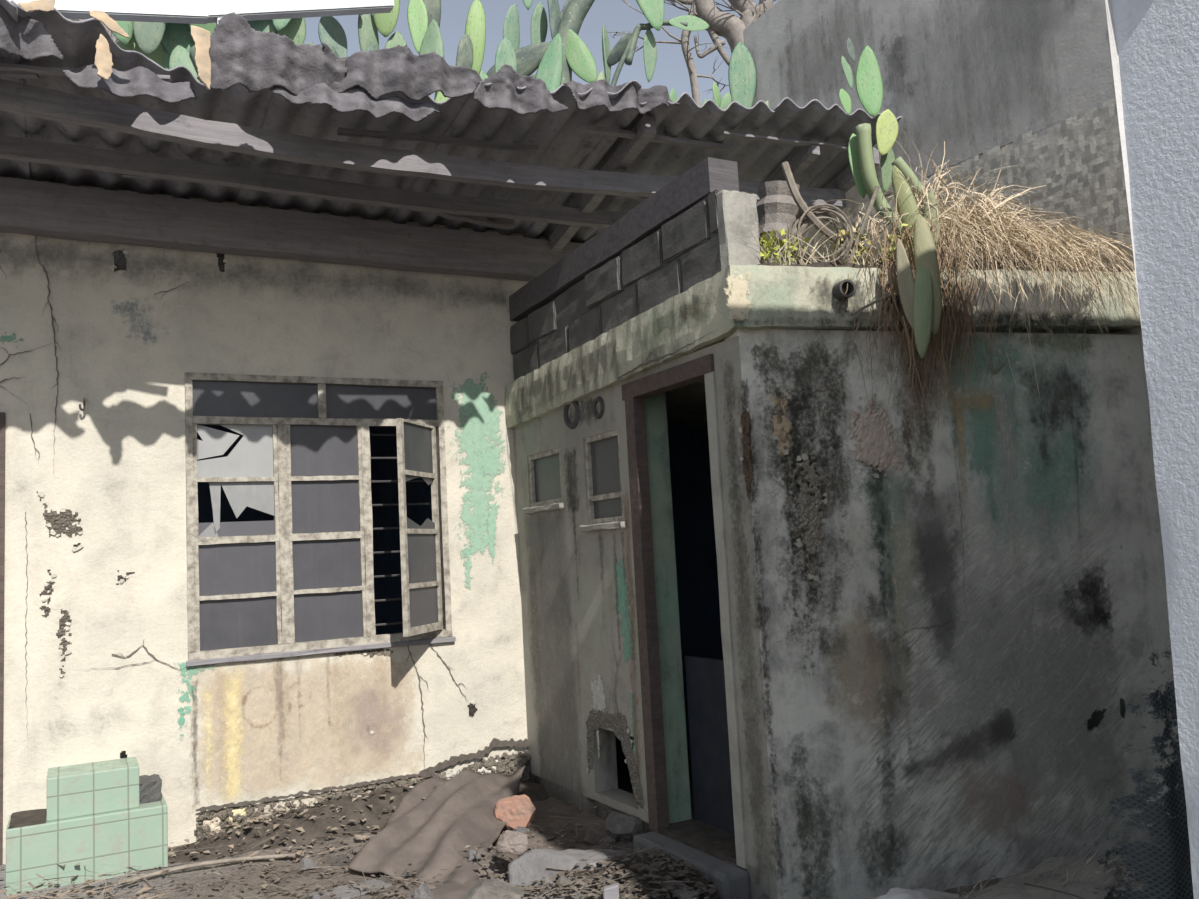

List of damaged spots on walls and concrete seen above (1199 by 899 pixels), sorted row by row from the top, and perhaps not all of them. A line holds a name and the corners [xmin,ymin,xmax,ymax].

water stain [724,271,752,321]
water stain [941,274,1098,326]
crack [0,236,62,473]
flaking render [847,394,905,478]
flaking render [37,491,83,552]
peeling [486,501,500,563]
flaking render [40,569,72,677]
water stain [724,342,855,899]
water stain [868,466,909,735]
water stain [916,463,1126,775]
crack [406,644,473,767]
spalling [585,709,644,812]